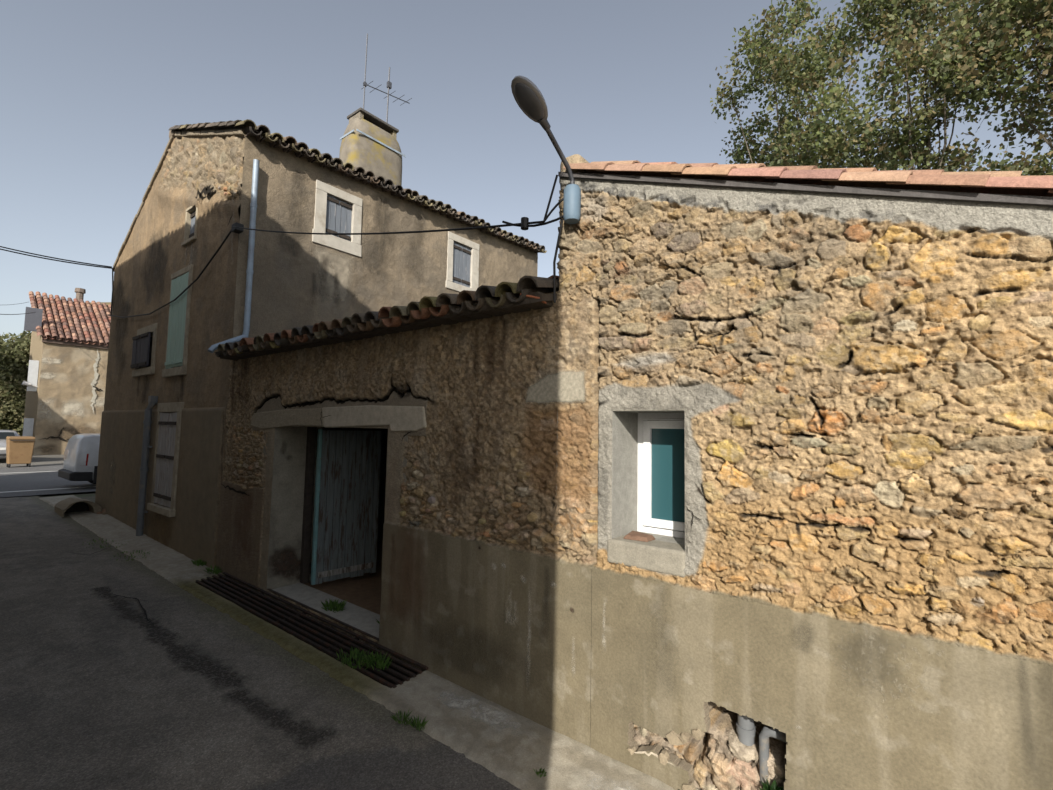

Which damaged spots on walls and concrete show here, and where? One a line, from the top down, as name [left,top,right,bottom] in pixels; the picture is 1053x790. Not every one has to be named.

crack [38,427,69,441]
crack [90,349,102,413]
crack [254,377,433,428]
spalling [627,701,788,790]